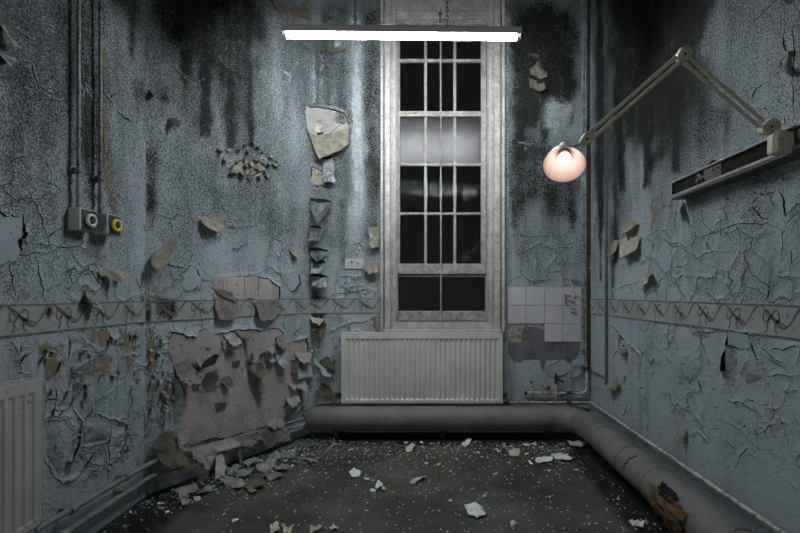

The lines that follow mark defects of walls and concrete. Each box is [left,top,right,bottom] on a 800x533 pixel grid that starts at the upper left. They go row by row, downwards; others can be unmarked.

leakage [0,0,308,249]
leakage [310,39,380,264]
leakage [505,0,581,286]
leakage [593,0,749,284]
crack [740,0,800,126]
peeling [0,206,33,269]
crack [0,192,210,302]
flaking render [22,103,353,471]
peeling [508,324,579,370]
crack [641,182,800,301]
peeling [720,326,755,386]
crack [44,388,133,488]